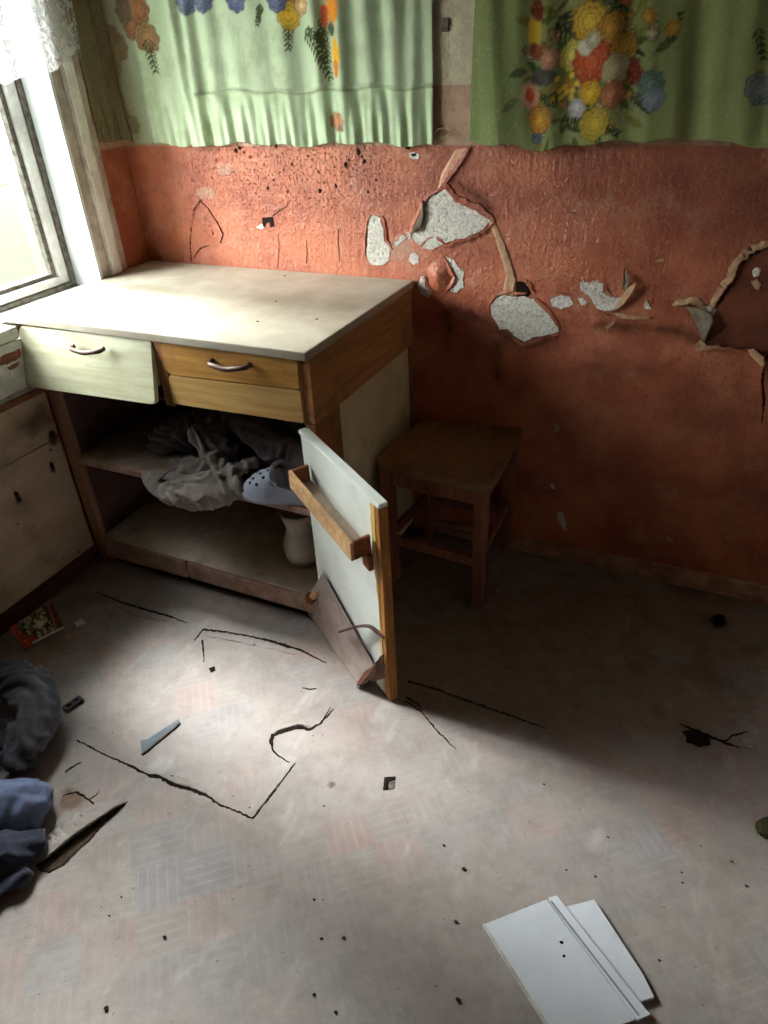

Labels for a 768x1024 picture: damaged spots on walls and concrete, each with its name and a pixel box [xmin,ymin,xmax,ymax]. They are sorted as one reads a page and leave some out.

crack [188,200,224,261]
flaking render [363,182,495,298]
flaking render [489,275,621,347]
peeling [672,240,768,359]
crack [96,592,326,663]
crack [404,680,546,749]
crack [62,687,334,819]